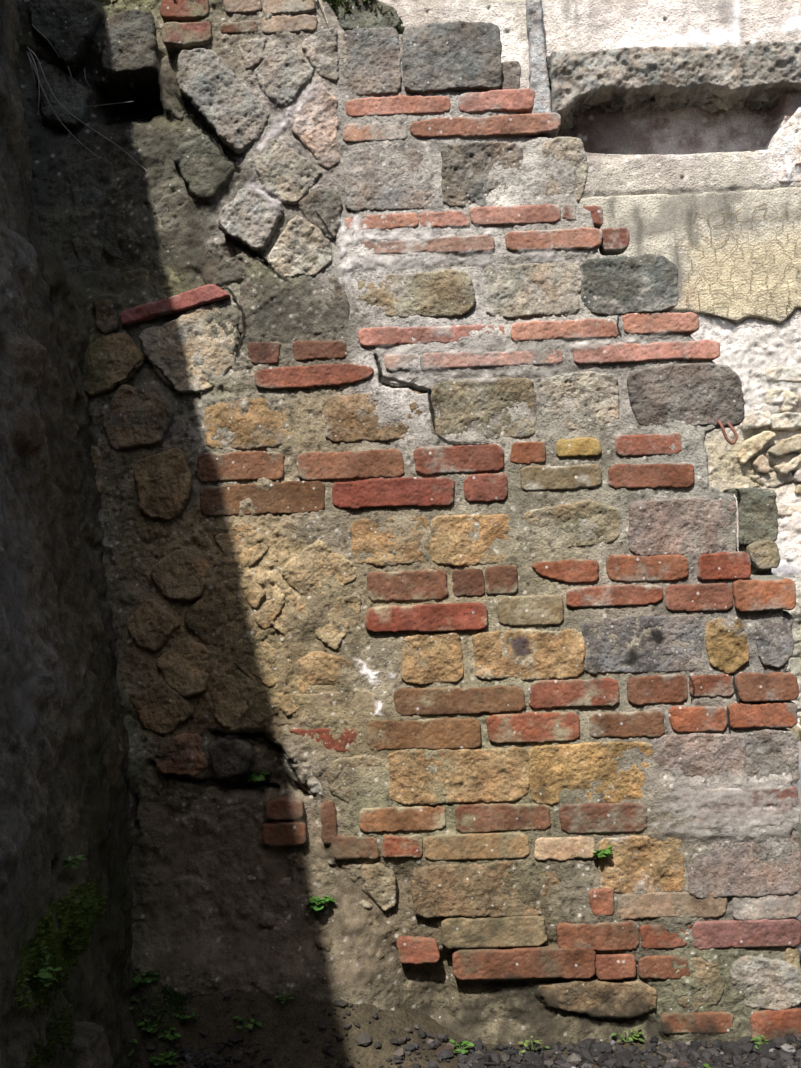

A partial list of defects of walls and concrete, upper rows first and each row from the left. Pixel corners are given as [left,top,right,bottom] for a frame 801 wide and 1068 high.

crack [675,203,801,326]
crack [374,353,490,444]
peeling [720,330,801,415]